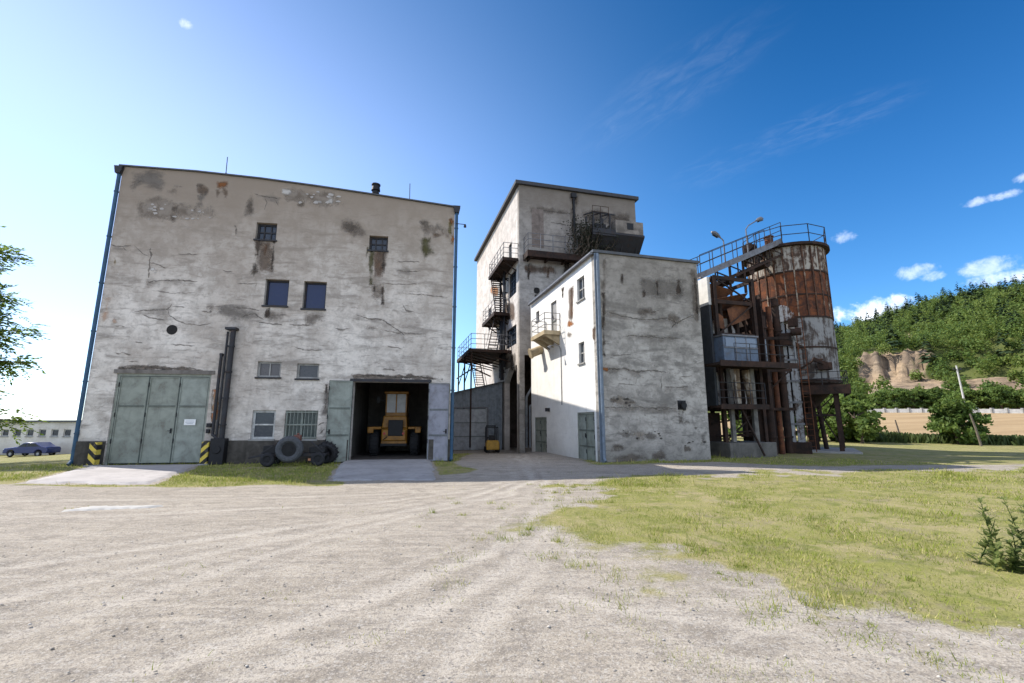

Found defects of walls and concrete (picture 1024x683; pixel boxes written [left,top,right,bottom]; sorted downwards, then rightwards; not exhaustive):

spalling [139,197,213,220]
spalling [282,189,341,206]
water stain [343,222,361,235]
water stain [421,221,439,256]
water stain [252,241,275,273]
water stain [367,247,386,304]
corrosion [754,271,833,317]